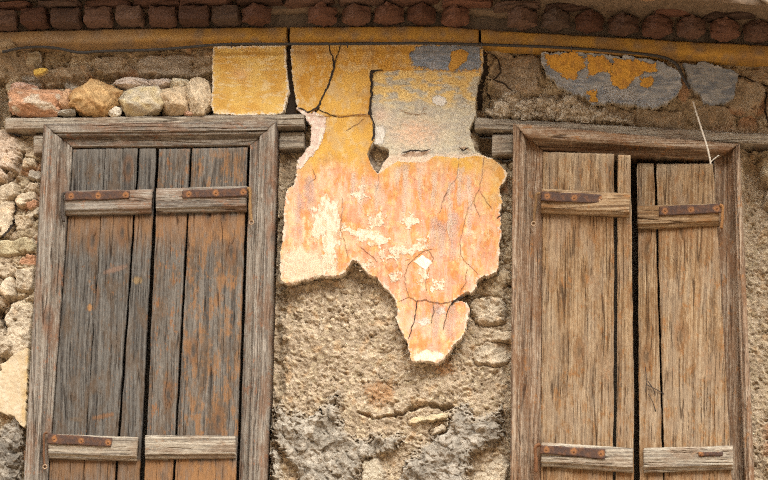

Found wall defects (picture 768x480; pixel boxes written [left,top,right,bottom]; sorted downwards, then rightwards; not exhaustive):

crack [287,31,383,141]
crack [477,33,512,111]
flaking render [541,51,738,110]
flaking render [210,42,508,366]
crack [398,147,502,338]